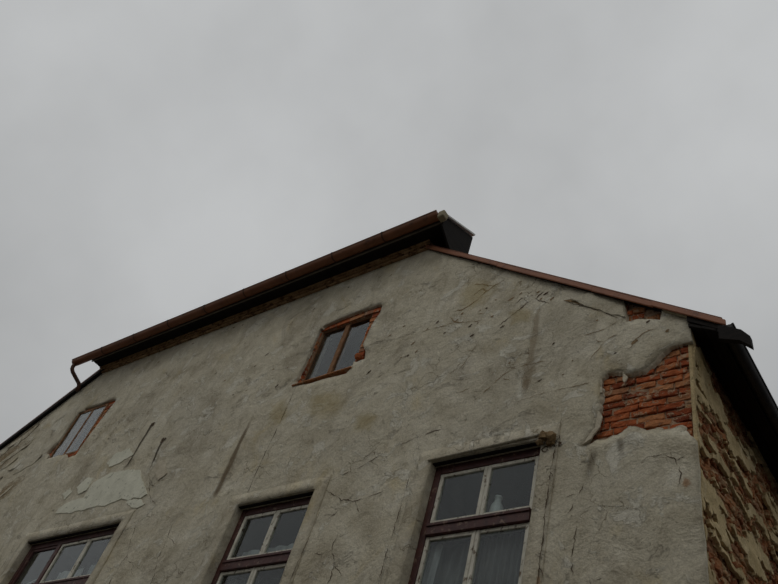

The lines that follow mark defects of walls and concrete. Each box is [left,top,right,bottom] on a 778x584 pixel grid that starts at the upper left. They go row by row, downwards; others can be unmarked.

flaking render [292,304,382,387]
flaking render [564,292,661,323]
flaking render [0,398,116,498]
flaking render [55,448,148,514]
crack [290,429,441,583]
crack [537,419,583,584]
flaking render [582,337,778,584]